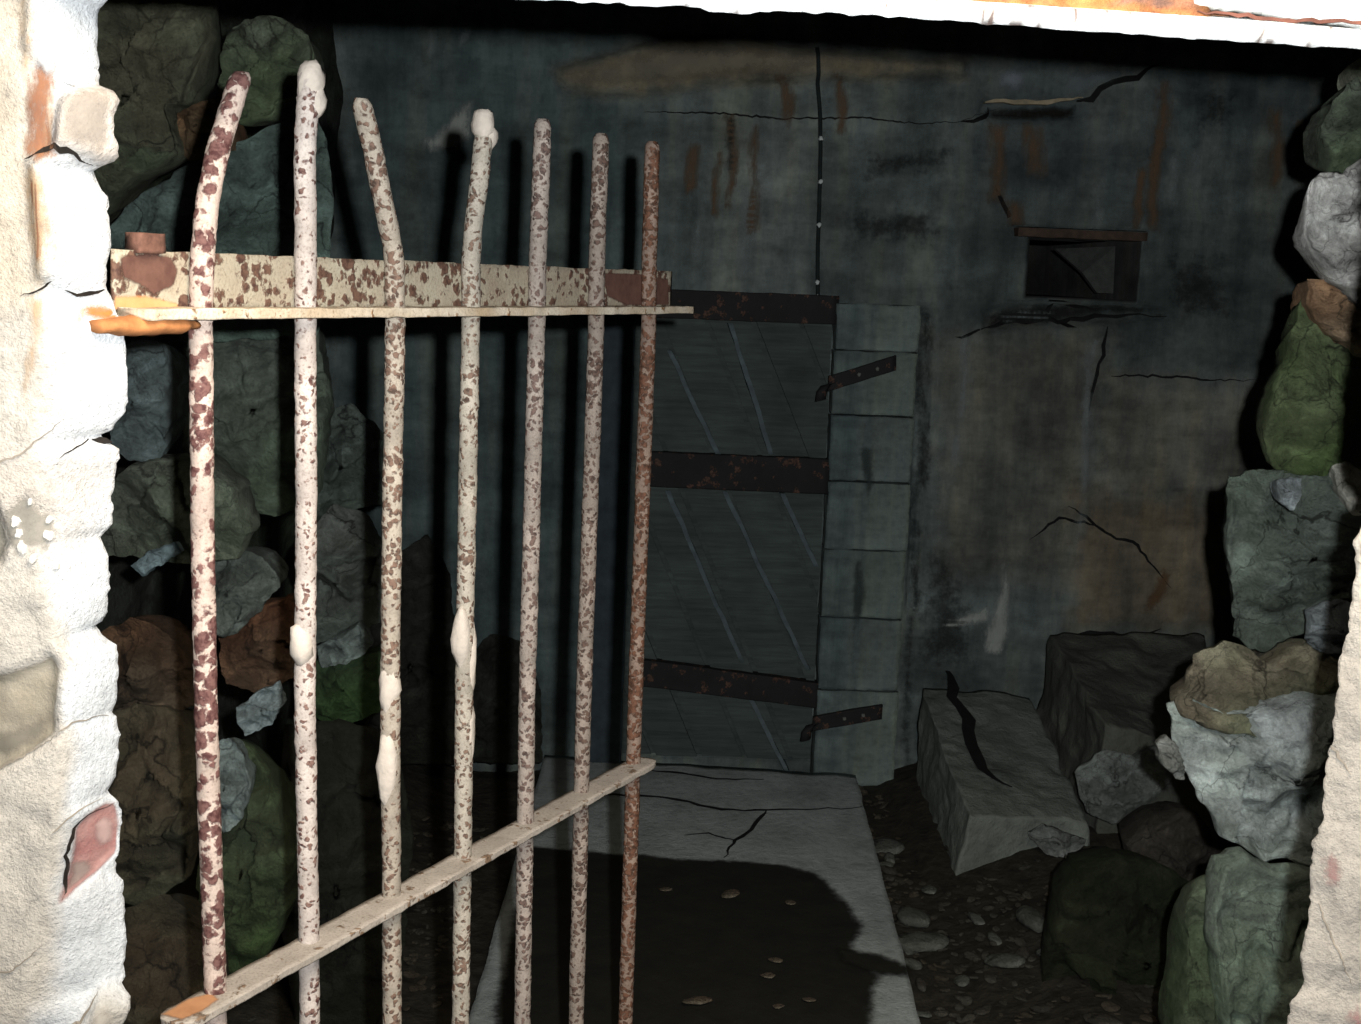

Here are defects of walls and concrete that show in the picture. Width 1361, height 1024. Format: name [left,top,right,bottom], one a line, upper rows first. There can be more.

crack [1198,10,1361,25]
crack [1076,65,1159,102]
crack [25,142,93,166]
spalling [0,498,61,570]
crack [1031,506,1172,589]
crack [607,770,862,858]
spalling [61,804,118,901]